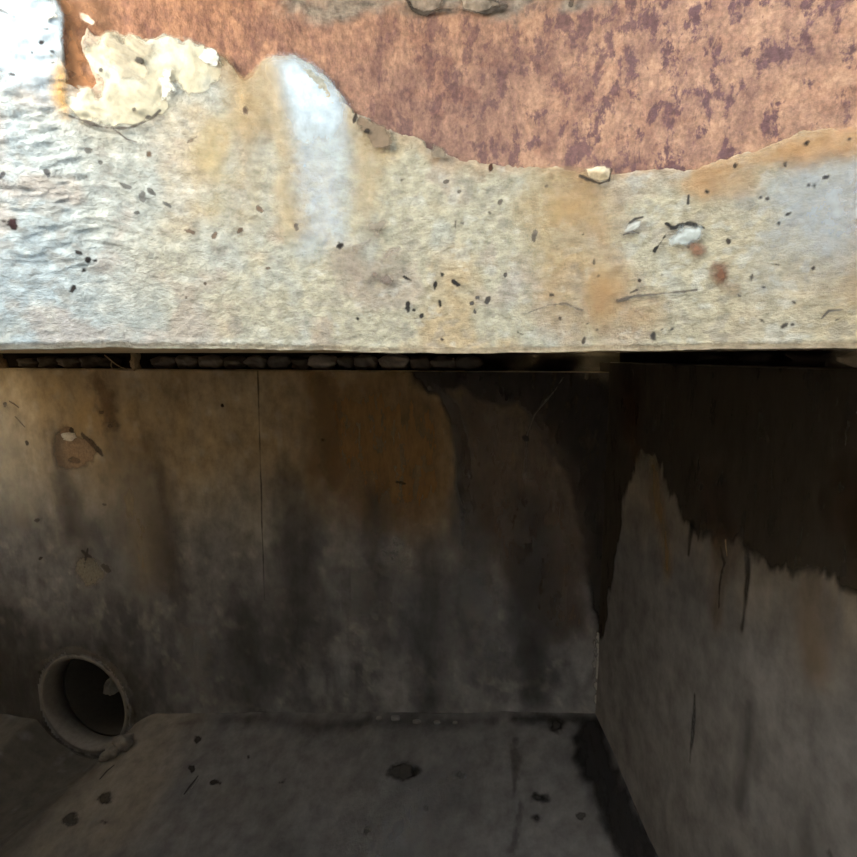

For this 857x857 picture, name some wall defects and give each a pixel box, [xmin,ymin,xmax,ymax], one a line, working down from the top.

peeling [406,0,452,16]
peeling [461,0,508,15]
peeling [579,166,613,184]
hole [120,183,171,214]
spalling [61,427,103,456]
water stain [412,363,857,704]
water stain [0,617,82,753]